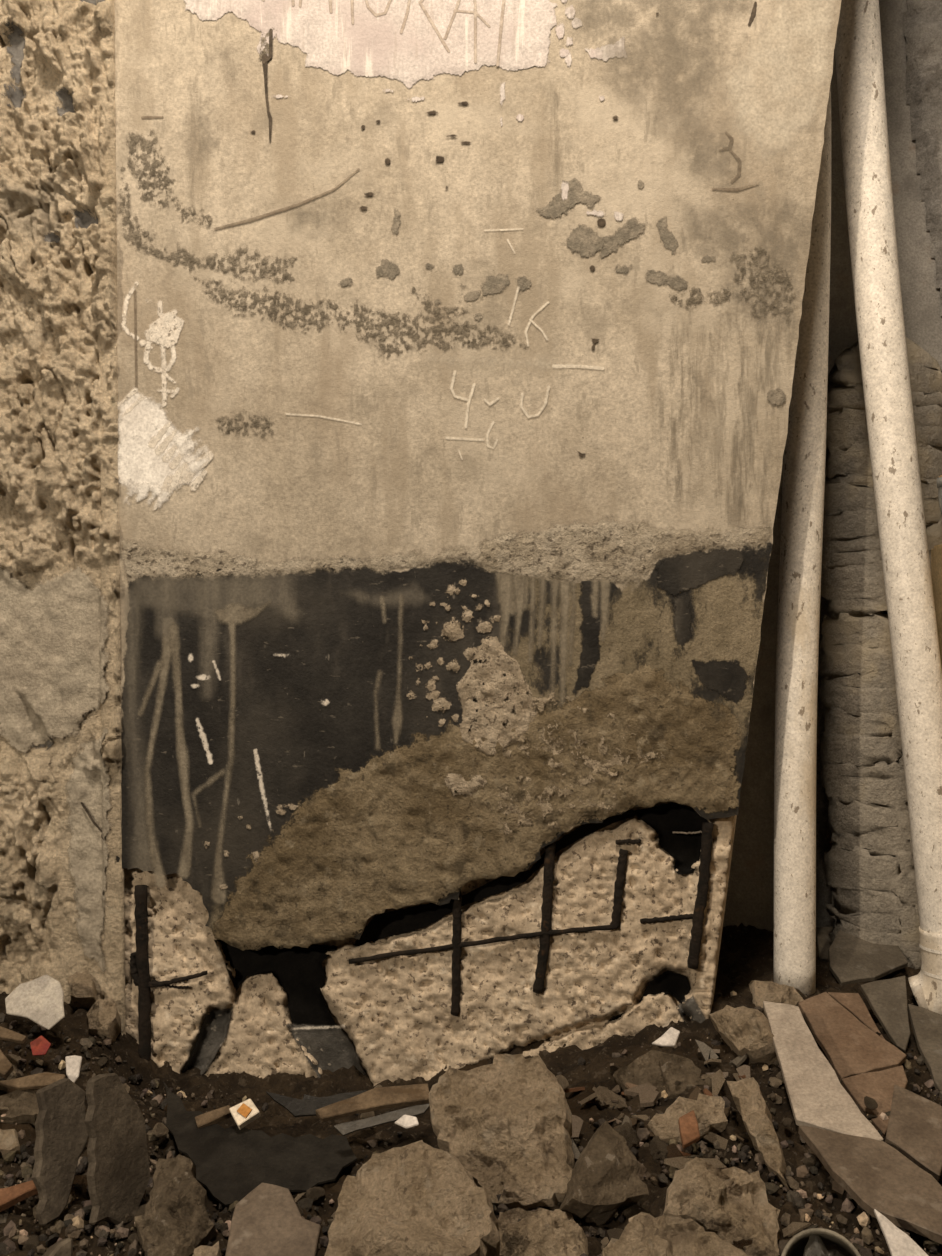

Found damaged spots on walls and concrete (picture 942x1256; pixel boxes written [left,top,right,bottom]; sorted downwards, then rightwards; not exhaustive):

damp [669,248,796,324]
spalling [120,515,772,585]
damp [139,624,224,878]
damp [407,573,669,836]
spalling [129,885,208,1061]
spalling [349,839,641,1016]
spalling [640,822,713,969]